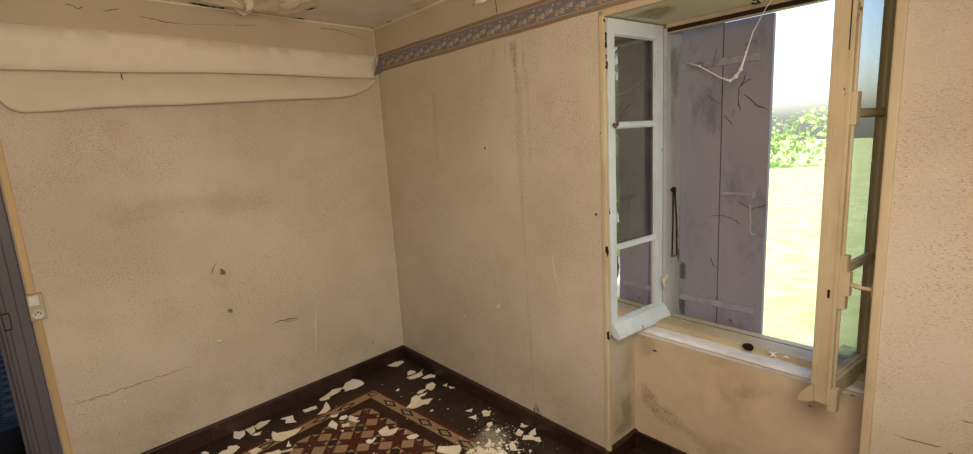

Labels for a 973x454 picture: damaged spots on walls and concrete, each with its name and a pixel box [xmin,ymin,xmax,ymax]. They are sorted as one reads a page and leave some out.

crack [65,4,216,25]
peeling [191,0,318,20]